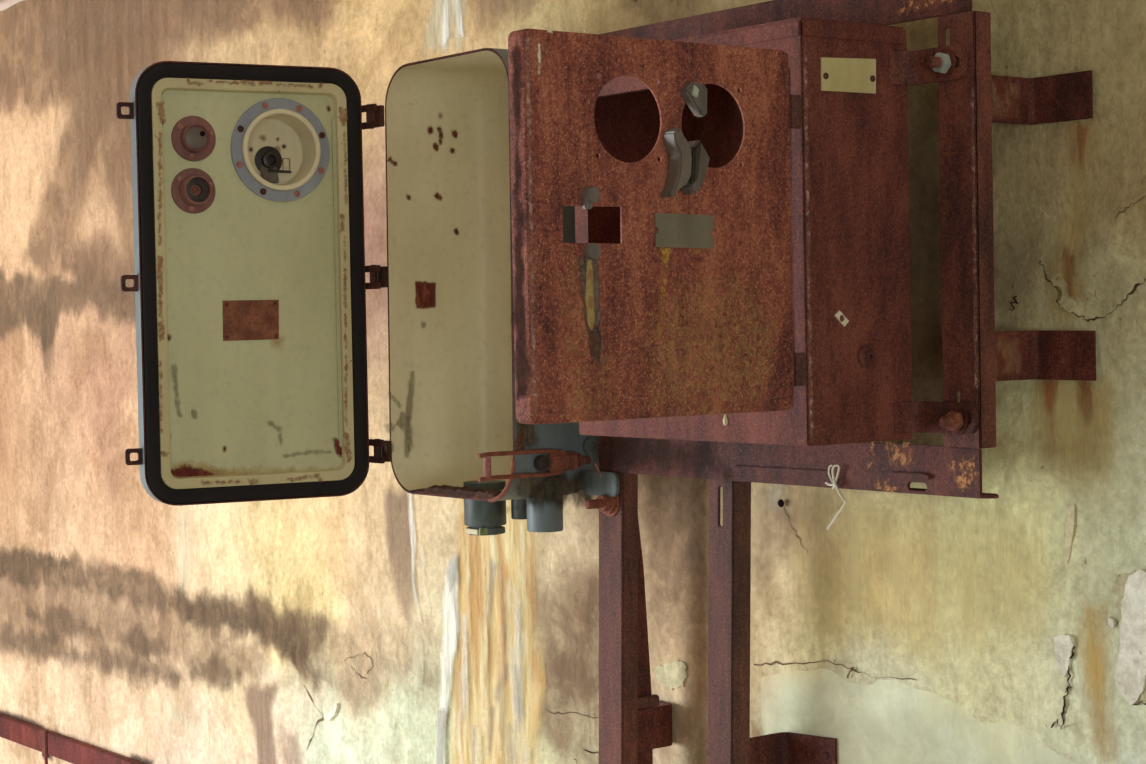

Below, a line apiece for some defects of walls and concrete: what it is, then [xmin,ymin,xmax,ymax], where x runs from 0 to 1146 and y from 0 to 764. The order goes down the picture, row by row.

damp [0,0,328,347]
crack [1039,250,1146,322]
damp [0,550,332,687]
damp [247,688,275,764]
damp [405,553,458,764]
rust [451,422,593,764]
crack [754,661,915,680]
flaking render [1054,634,1076,693]
flaking render [1108,569,1146,705]